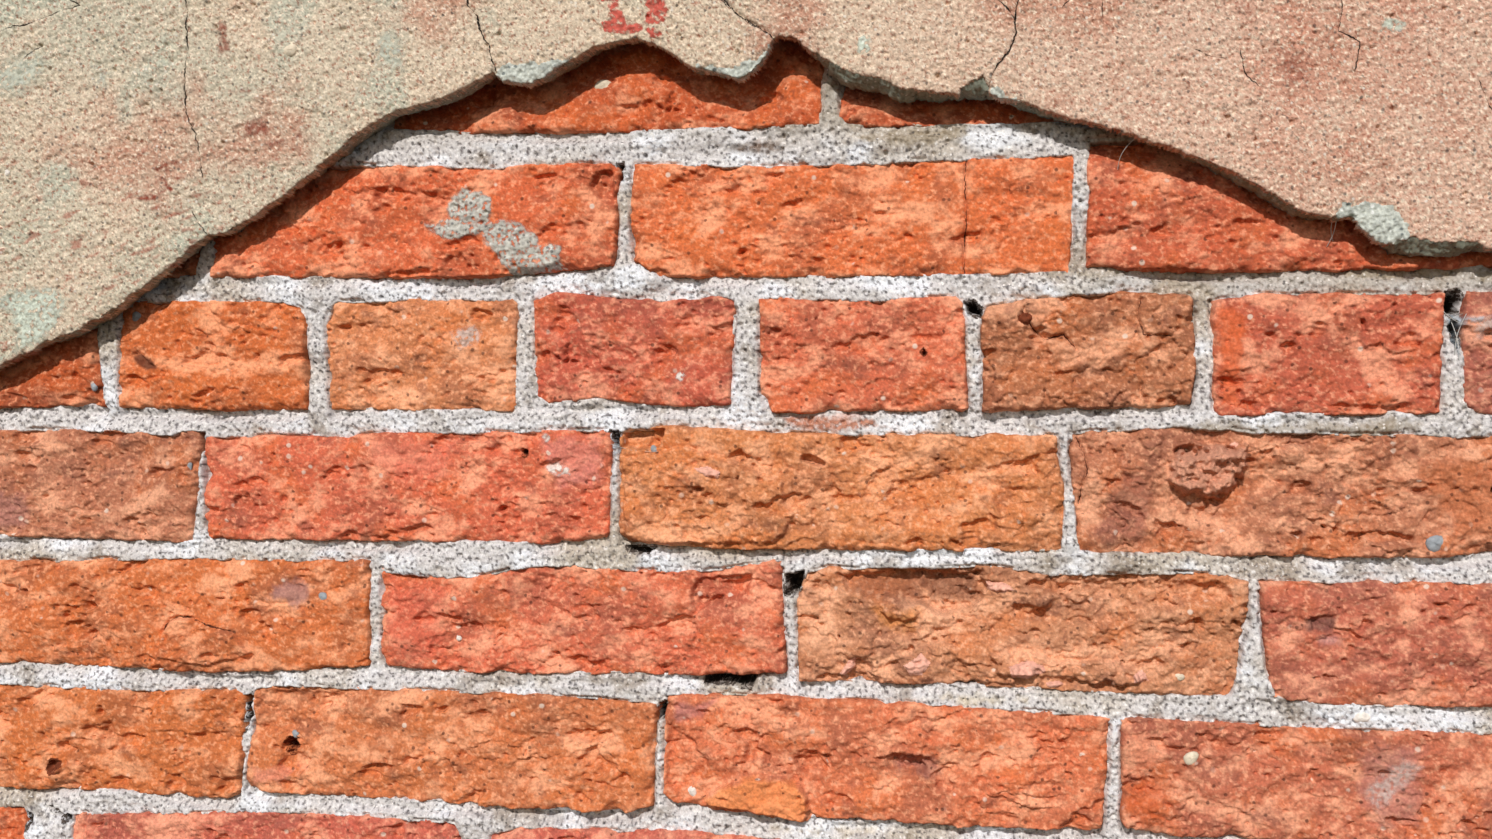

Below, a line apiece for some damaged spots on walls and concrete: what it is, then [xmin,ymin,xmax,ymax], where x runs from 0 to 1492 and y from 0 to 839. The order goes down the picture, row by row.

crack [1,0,80,57]
crack [466,0,497,73]
crack [721,0,777,43]
crack [988,0,1019,87]
crack [184,0,203,177]
spalling [812,52,1492,257]
spalling [0,38,779,369]